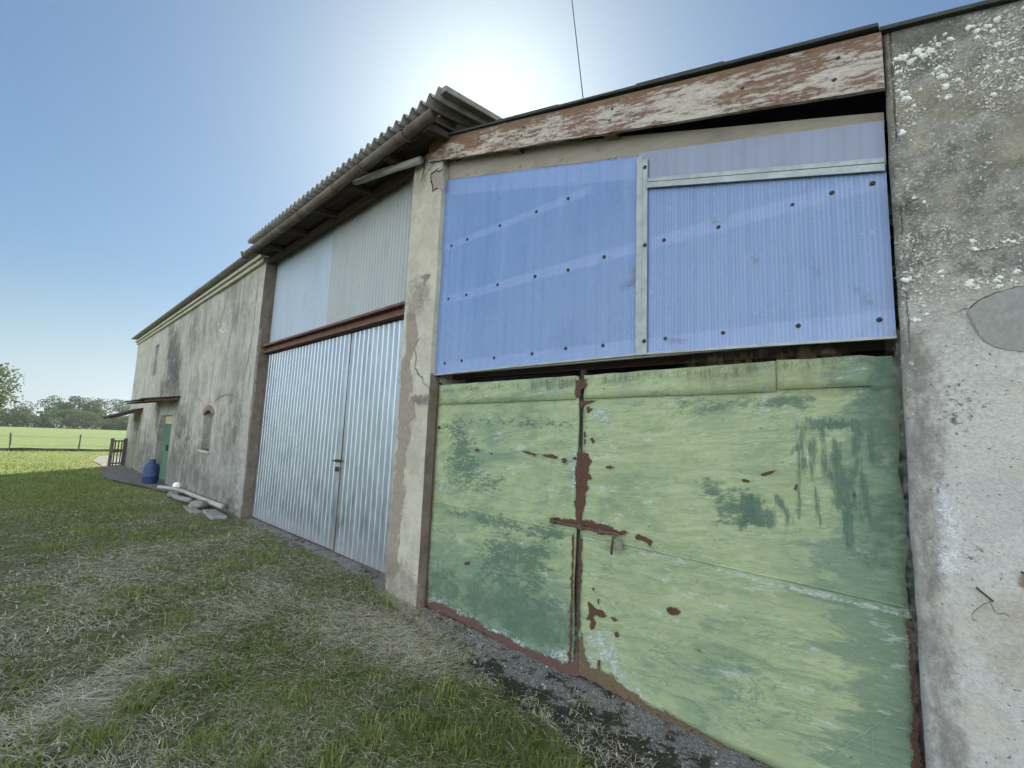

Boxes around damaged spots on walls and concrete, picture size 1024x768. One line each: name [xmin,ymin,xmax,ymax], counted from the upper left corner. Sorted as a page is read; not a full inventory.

leakage [895,16,982,77]
corrosion [575,379,596,413]
corrosion [428,432,723,747]
corrosion [905,618,922,768]